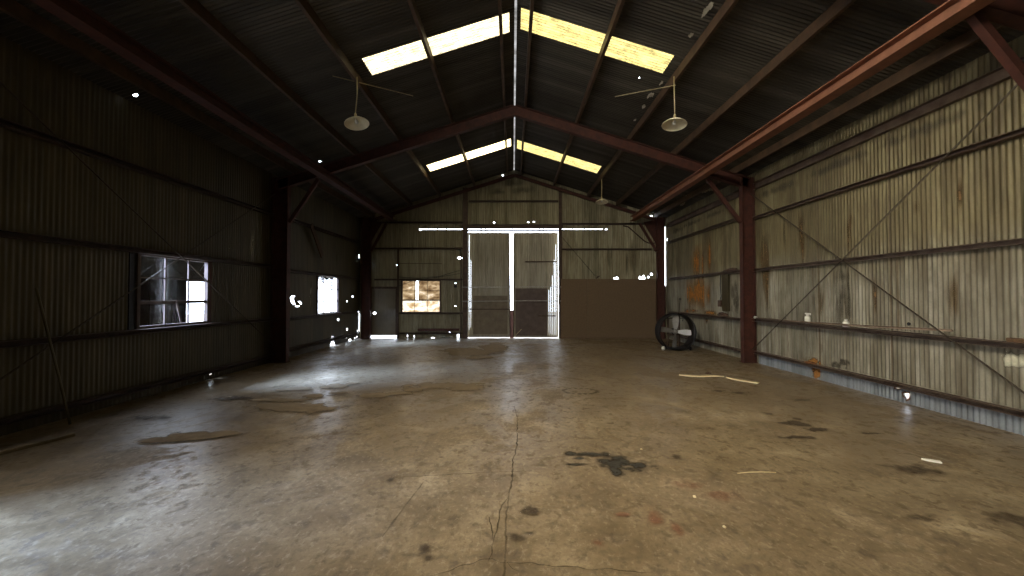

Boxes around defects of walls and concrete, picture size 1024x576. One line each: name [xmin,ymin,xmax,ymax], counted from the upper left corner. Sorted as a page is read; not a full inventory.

crack [454,406,584,573]